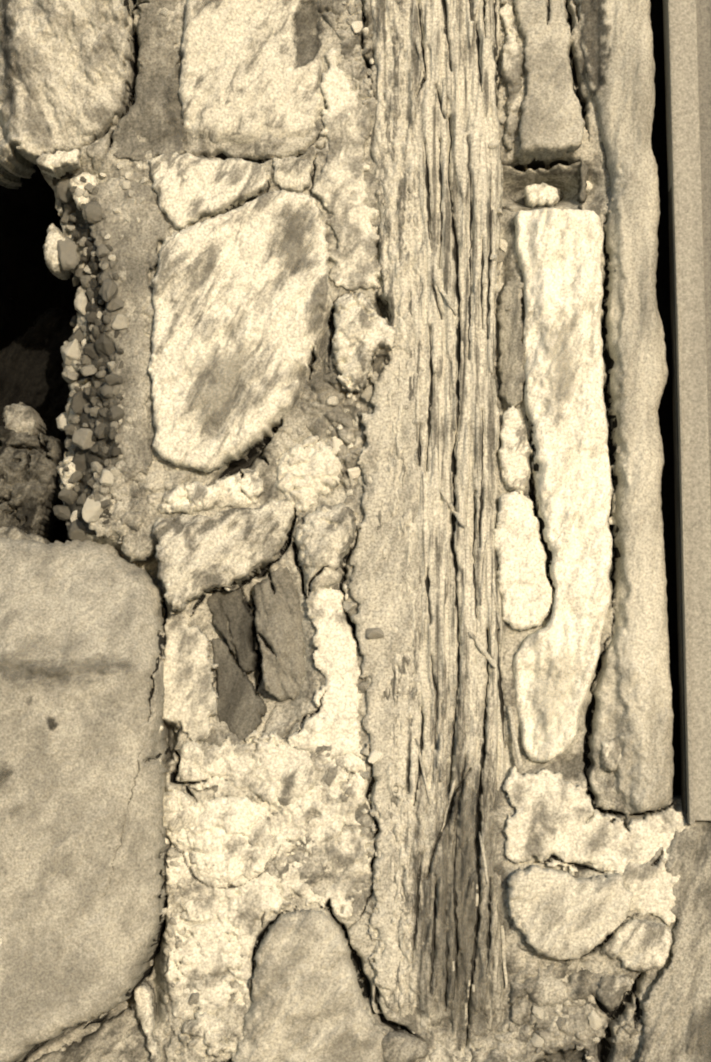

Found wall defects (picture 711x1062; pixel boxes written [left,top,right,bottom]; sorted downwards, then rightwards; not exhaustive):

crack [207,423,283,487]
crack [148,511,360,740]
crack [103,747,207,897]
crack [321,744,416,1035]
crack [538,854,613,873]